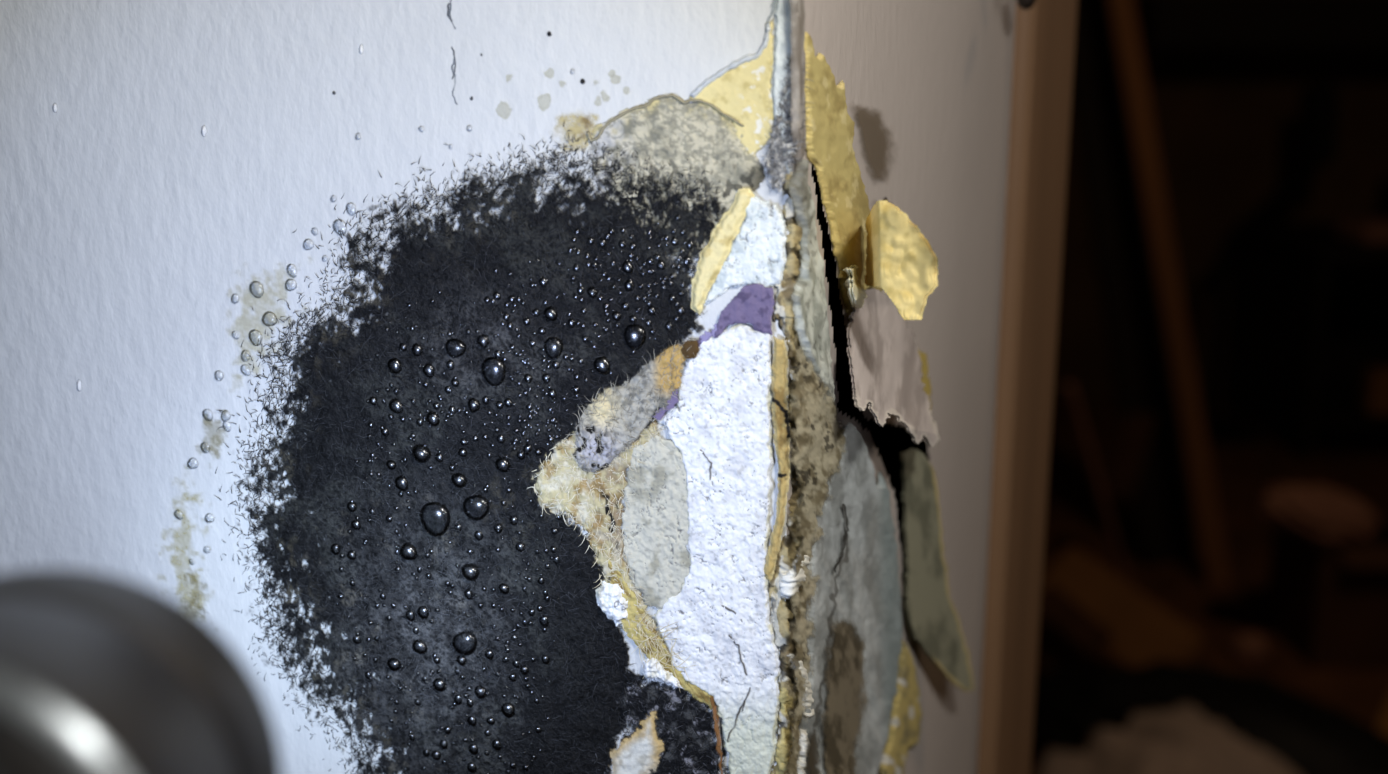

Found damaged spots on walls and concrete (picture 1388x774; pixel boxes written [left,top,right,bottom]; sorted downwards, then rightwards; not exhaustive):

crack [447,0,457,104]
peeling [689,19,775,155]
peeling [804,32,939,322]
damp [204,56,814,774]
flaking render [622,172,815,774]
peeling [918,350,932,410]
flaking render [610,711,664,774]
peeling [879,640,923,774]